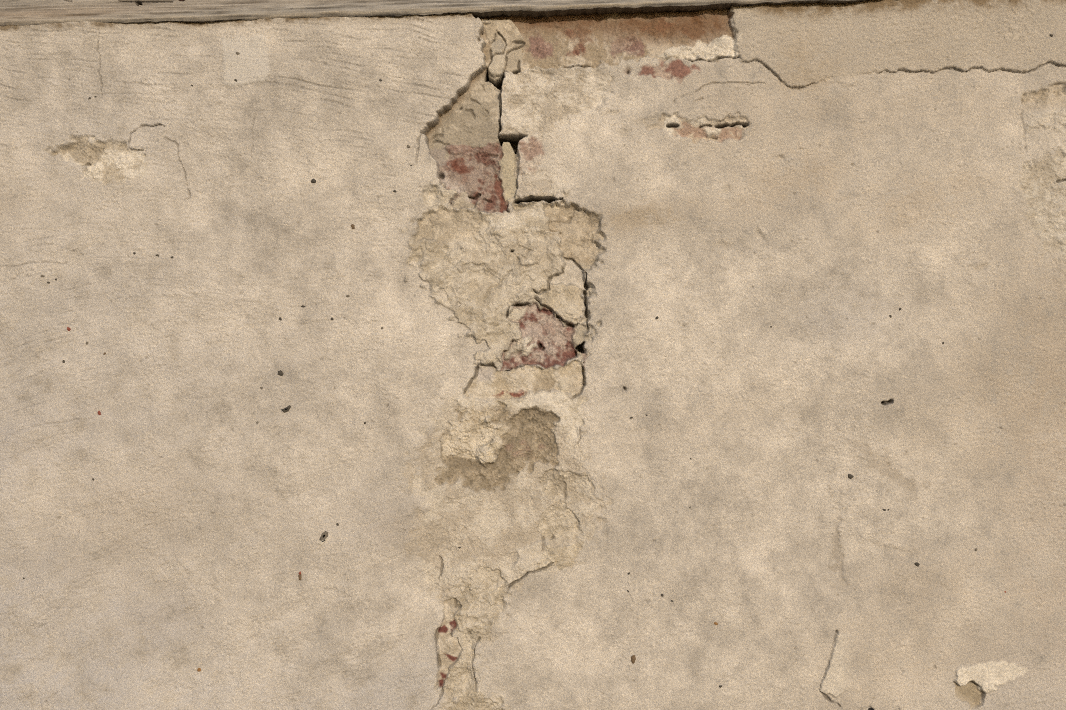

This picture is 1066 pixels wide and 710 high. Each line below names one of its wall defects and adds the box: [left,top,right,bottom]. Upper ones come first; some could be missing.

crack [694,60,815,94]
crack [878,62,1066,75]
spalling [51,136,148,185]
spalling [402,7,750,710]
spalling [953,662,1008,710]